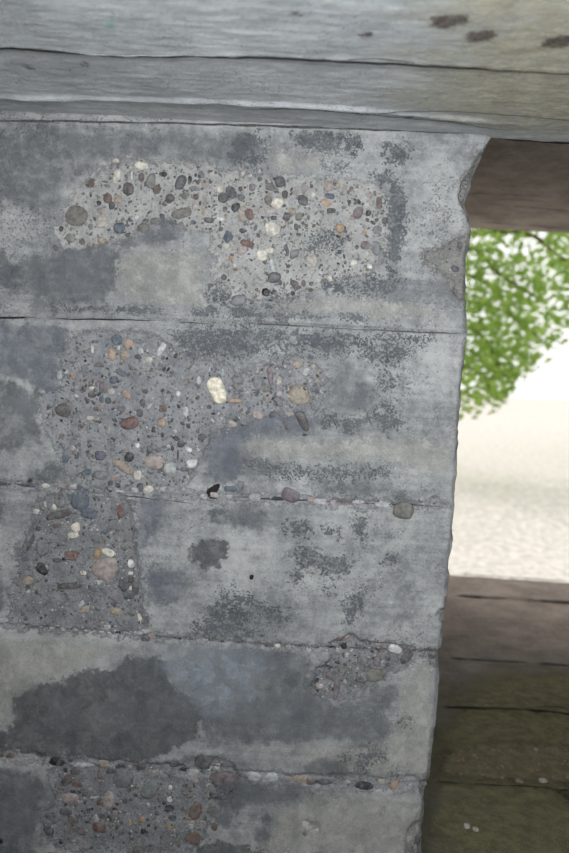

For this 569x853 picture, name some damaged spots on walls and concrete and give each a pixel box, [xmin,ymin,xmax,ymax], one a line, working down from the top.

crack [0,45,569,75]
crack [0,108,569,144]
spalling [6,127,437,644]
spalling [276,511,440,710]
leakage [0,648,395,762]
spalling [35,754,242,853]